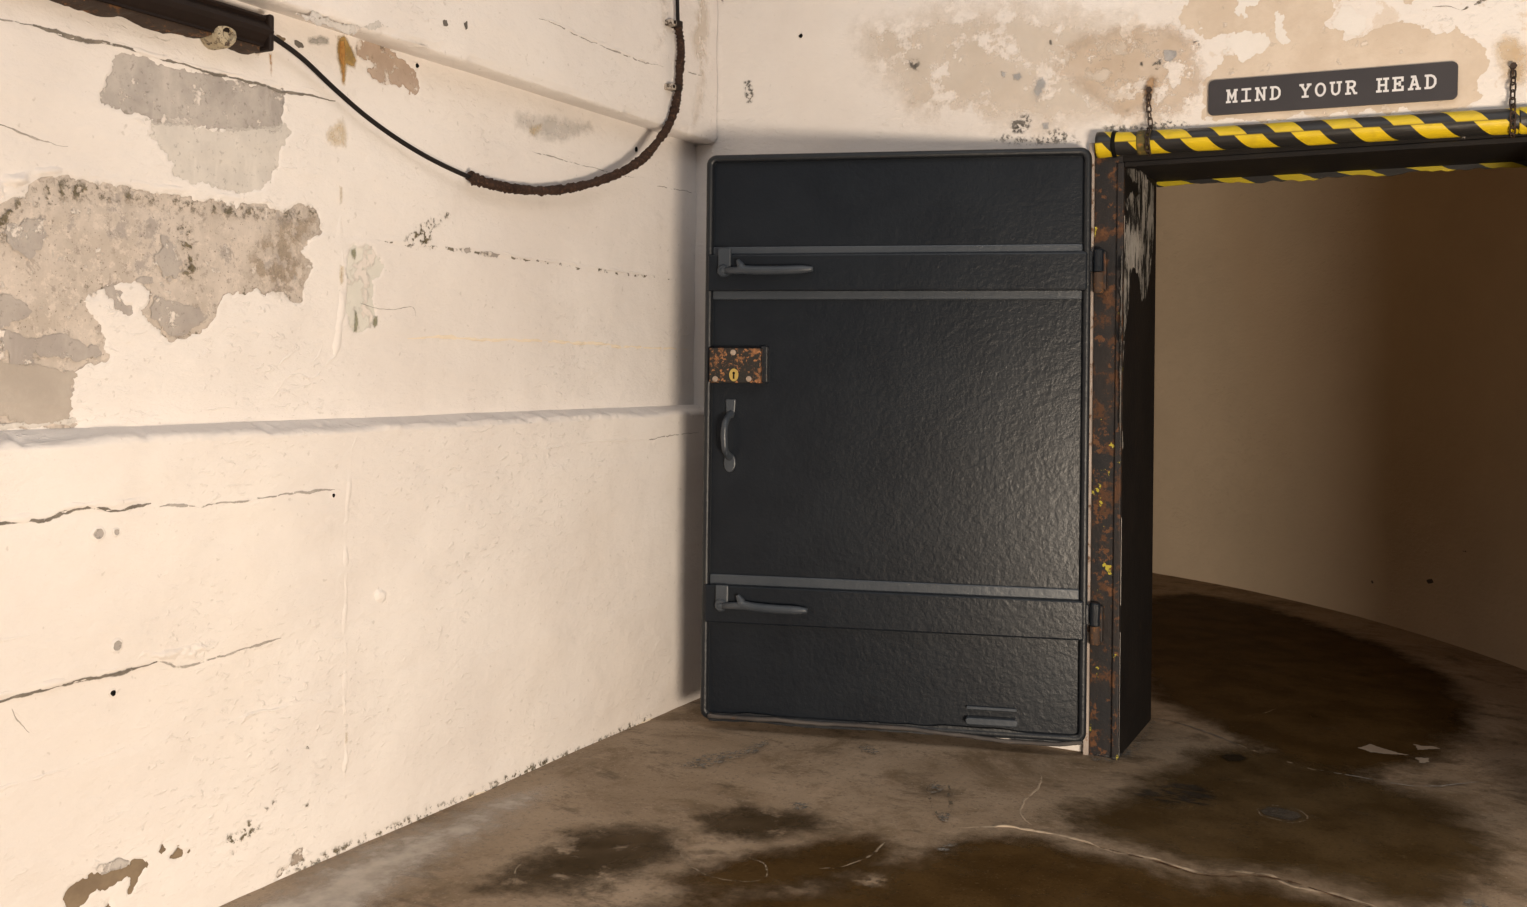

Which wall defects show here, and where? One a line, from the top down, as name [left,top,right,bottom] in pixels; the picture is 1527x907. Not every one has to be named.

peeling [1179,0,1490,123]
peeling [0,53,322,430]
crack [0,489,335,525]
crack [0,638,280,703]
damp [672,593,1498,907]
peeling [63,844,190,907]
damp [480,825,676,893]